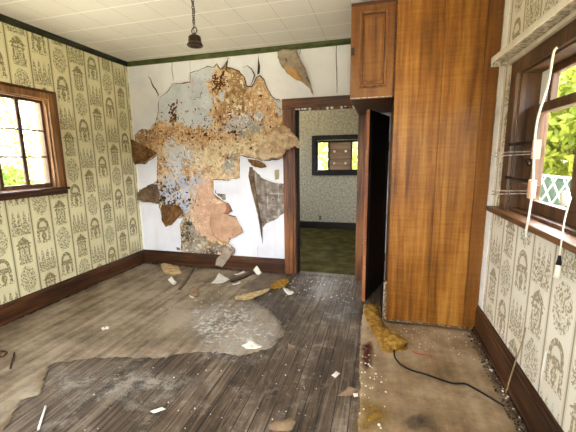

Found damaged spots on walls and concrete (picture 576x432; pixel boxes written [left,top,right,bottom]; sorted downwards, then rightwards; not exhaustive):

peeling [130,56,301,255]
peeling [277,49,313,94]